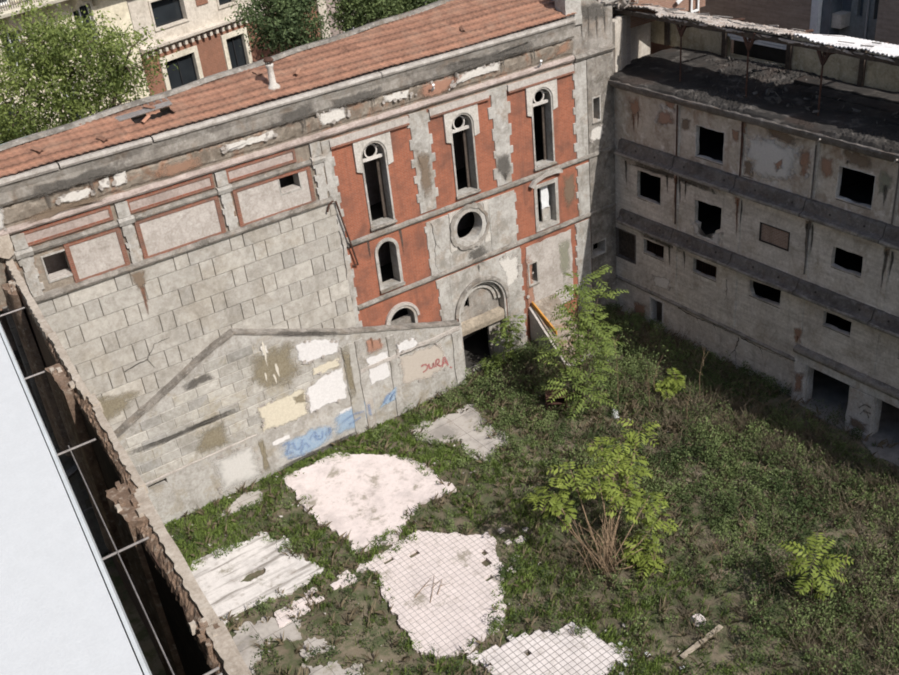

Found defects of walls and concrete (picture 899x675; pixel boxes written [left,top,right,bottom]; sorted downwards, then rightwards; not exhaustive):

peeling [382,61,503,104]
peeling [316,107,351,125]
peeling [220,130,278,154]
peeling [55,171,128,205]
leakage [881,247,894,286]
leakage [260,341,280,383]
peeling [296,339,342,375]
peeling [257,388,318,432]